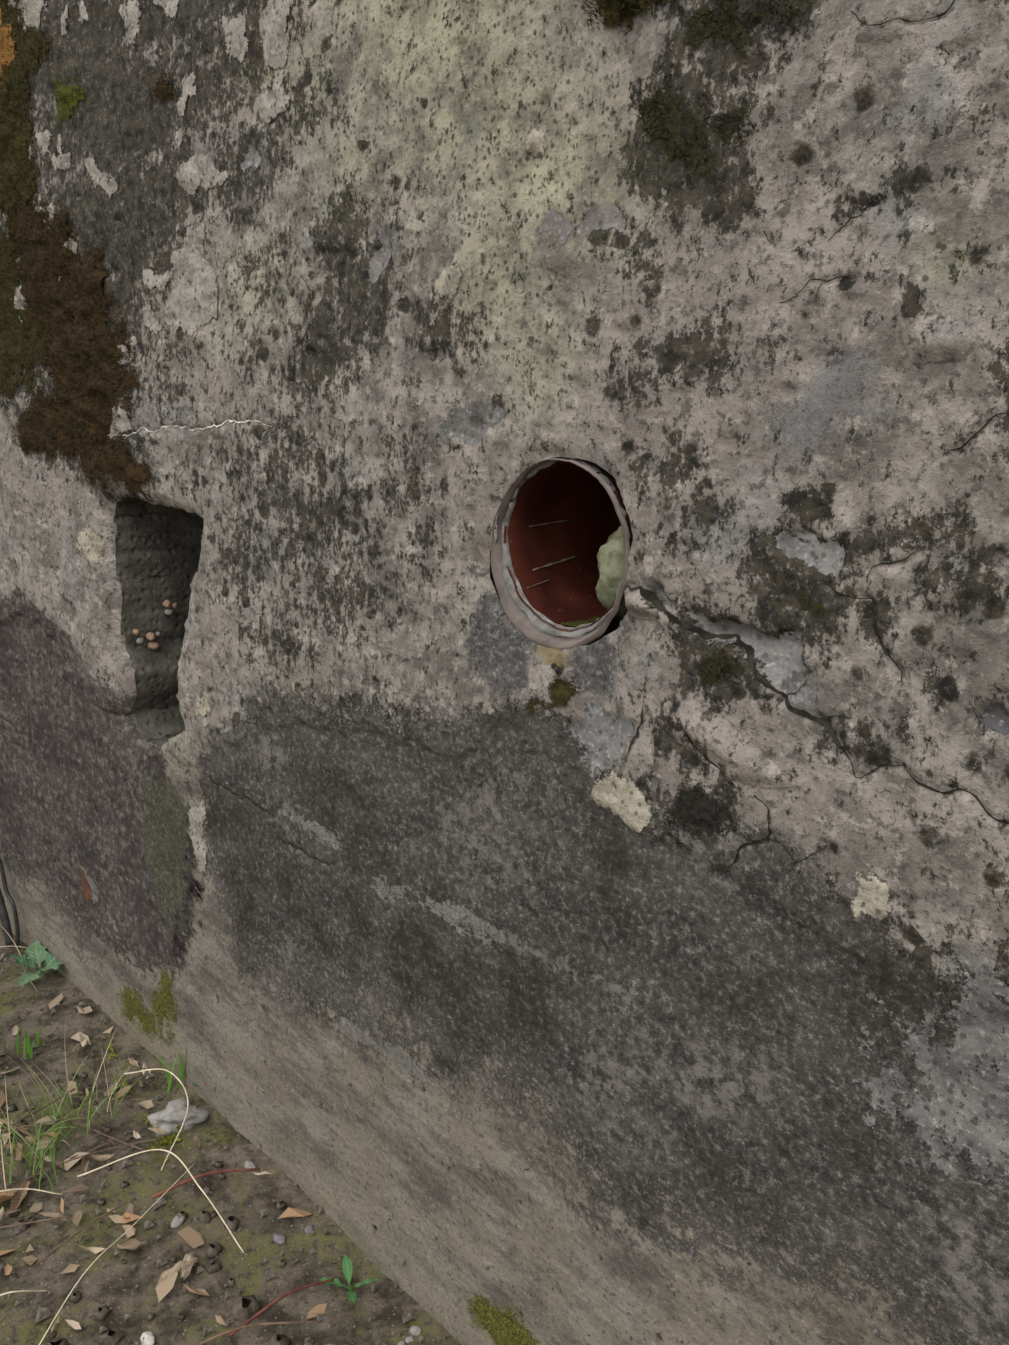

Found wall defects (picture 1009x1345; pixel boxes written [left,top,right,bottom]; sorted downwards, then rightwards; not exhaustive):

peeling [192,695,212,717]
crack [620,701,827,895]
crack [625,586,1009,824]
crack [822,536,929,682]
water stain [0,583,1009,1345]